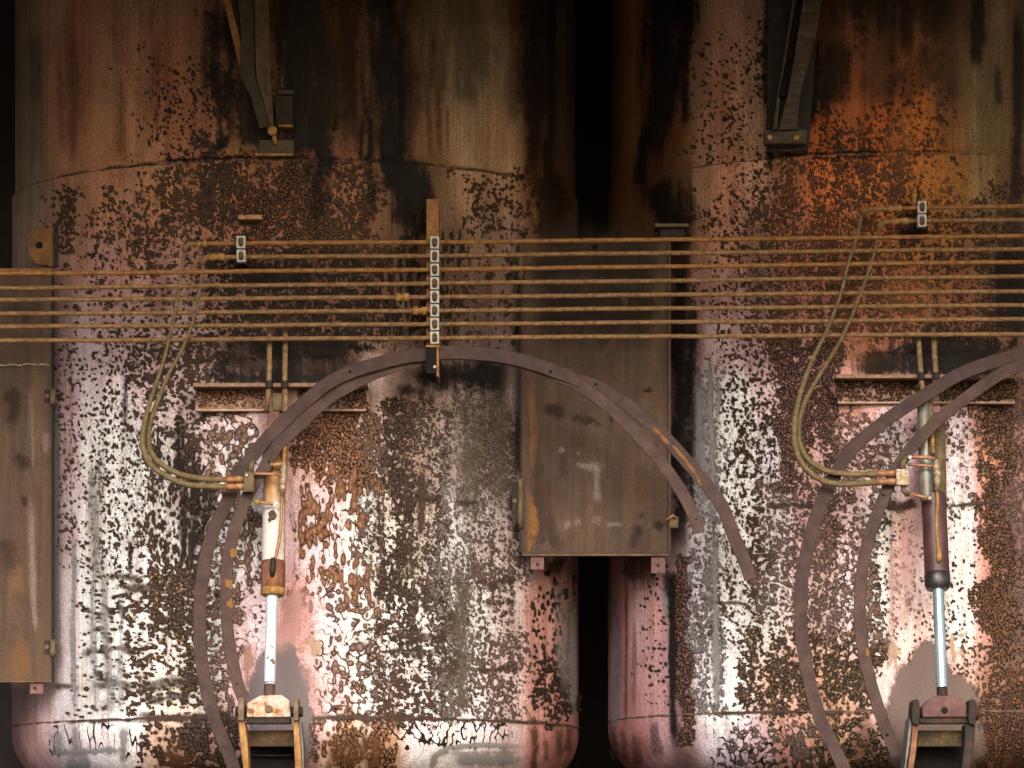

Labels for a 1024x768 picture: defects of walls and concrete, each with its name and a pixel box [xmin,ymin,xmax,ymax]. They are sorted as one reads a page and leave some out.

leakage [202,0,435,236]
leakage [634,0,700,226]
peeling [54,343,88,568]
peeling [197,412,259,531]
rust [38,43,426,768]
peeling [219,402,536,762]
rust [309,384,583,768]
rust [616,17,1024,768]